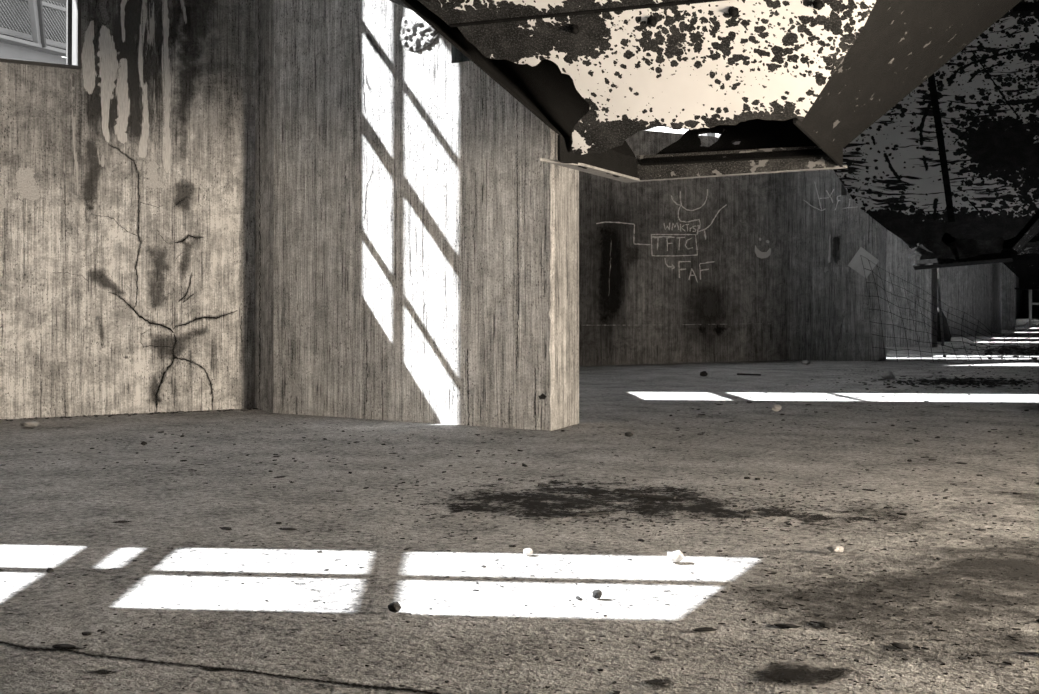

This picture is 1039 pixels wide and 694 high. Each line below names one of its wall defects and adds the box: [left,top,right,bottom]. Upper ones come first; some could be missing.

water stain [70,0,213,210]
crack [53,1,261,408]
spalling [399,17,439,52]
crack [0,642,440,694]